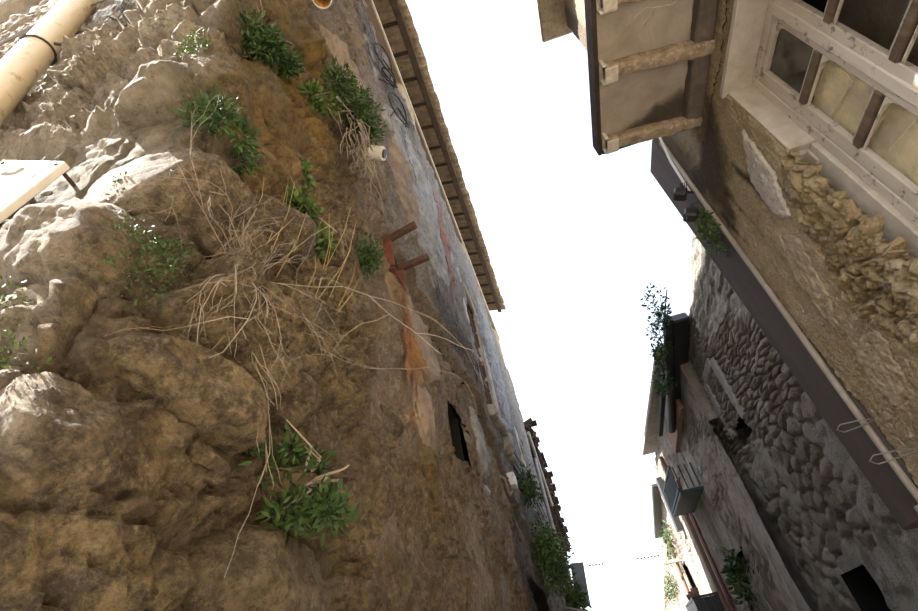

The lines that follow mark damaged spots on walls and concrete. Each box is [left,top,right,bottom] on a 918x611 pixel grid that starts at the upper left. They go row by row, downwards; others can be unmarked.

spalling [742,129,892,301]